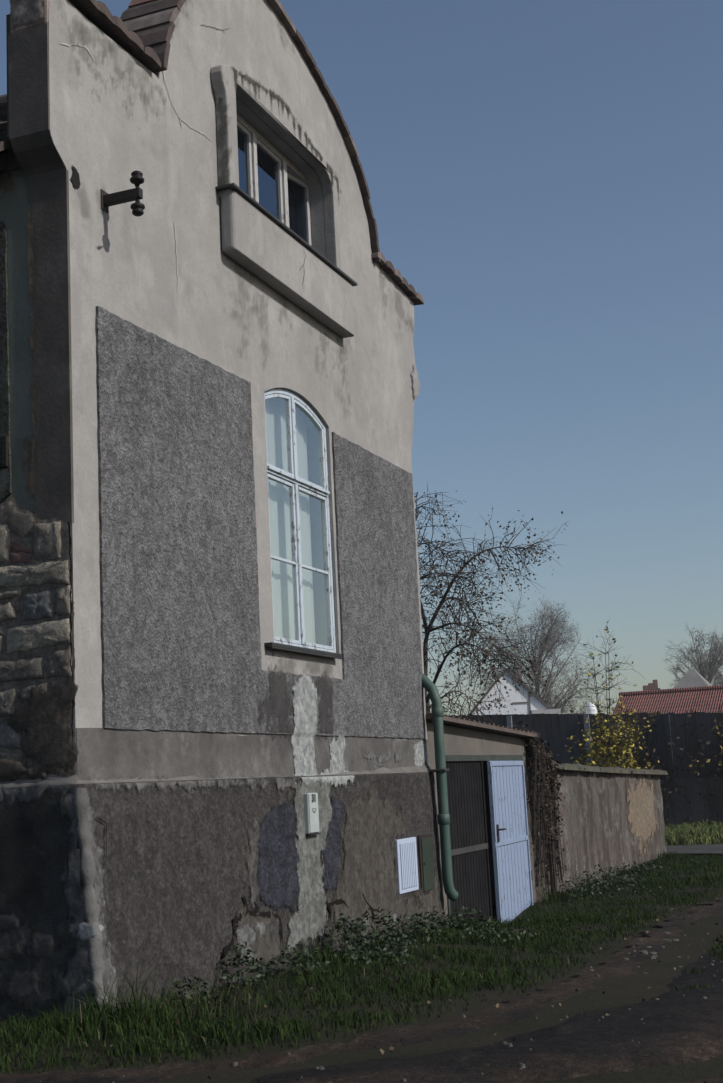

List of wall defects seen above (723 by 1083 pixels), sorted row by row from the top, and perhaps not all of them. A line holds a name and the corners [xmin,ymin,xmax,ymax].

peeling [9,0,46,30]
leakage [234,68,339,193]
flaking render [0,495,300,1024]